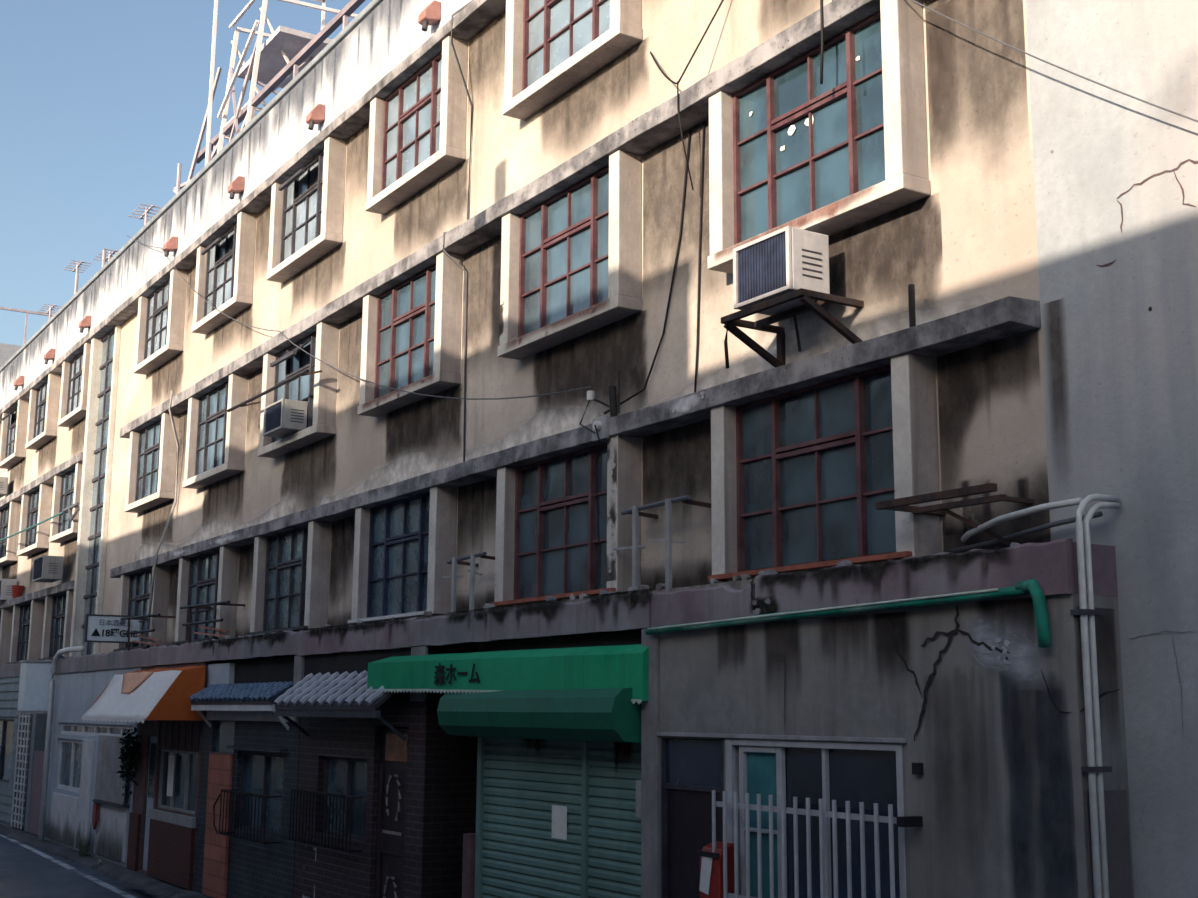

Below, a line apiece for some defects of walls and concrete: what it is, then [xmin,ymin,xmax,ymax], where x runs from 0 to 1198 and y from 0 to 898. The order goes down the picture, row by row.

leakage [925,0,1027,156]
leakage [3,40,345,383]
leakage [346,122,370,173]
leakage [394,159,468,243]
leakage [643,118,710,268]
crack [1097,159,1198,267]
leakage [462,234,502,348]
leakage [135,311,646,617]
leakage [643,419,711,511]
crack [886,605,1010,741]
crack [1041,670,1120,714]
leakage [1001,670,1076,898]